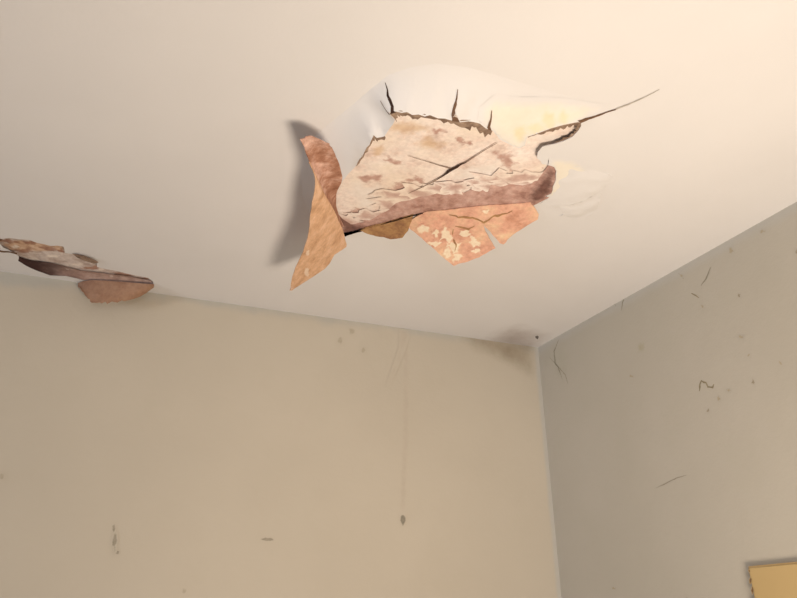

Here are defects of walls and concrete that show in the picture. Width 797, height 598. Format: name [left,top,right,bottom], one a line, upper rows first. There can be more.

peeling [0,238,154,304]
flaking render [290,83,581,291]